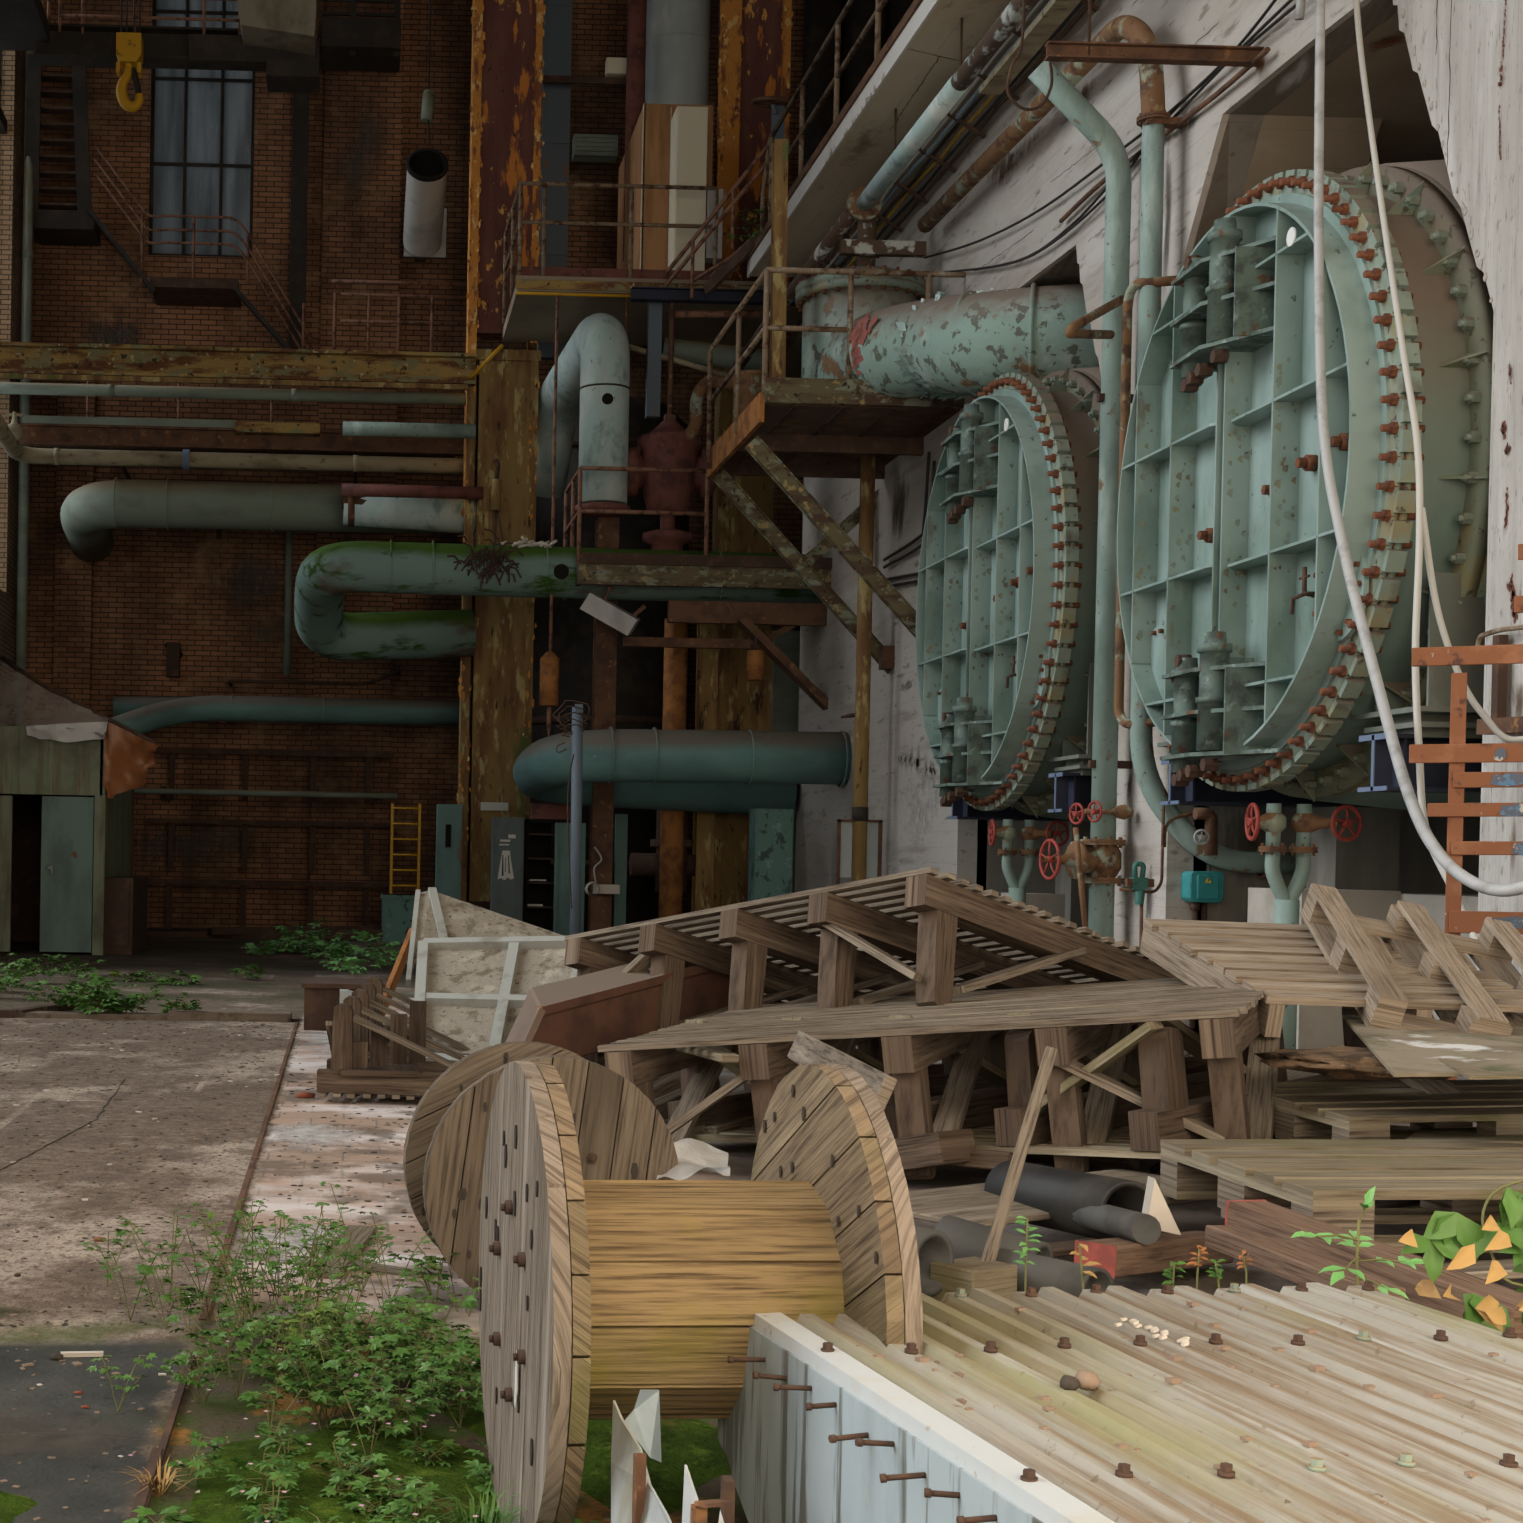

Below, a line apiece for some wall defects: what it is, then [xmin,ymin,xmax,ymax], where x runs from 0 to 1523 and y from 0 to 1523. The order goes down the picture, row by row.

corrosion [466,0,486,334]
corrosion [530,0,546,266]
peeling [892,291,977,401]
crack [0,1079,125,1170]